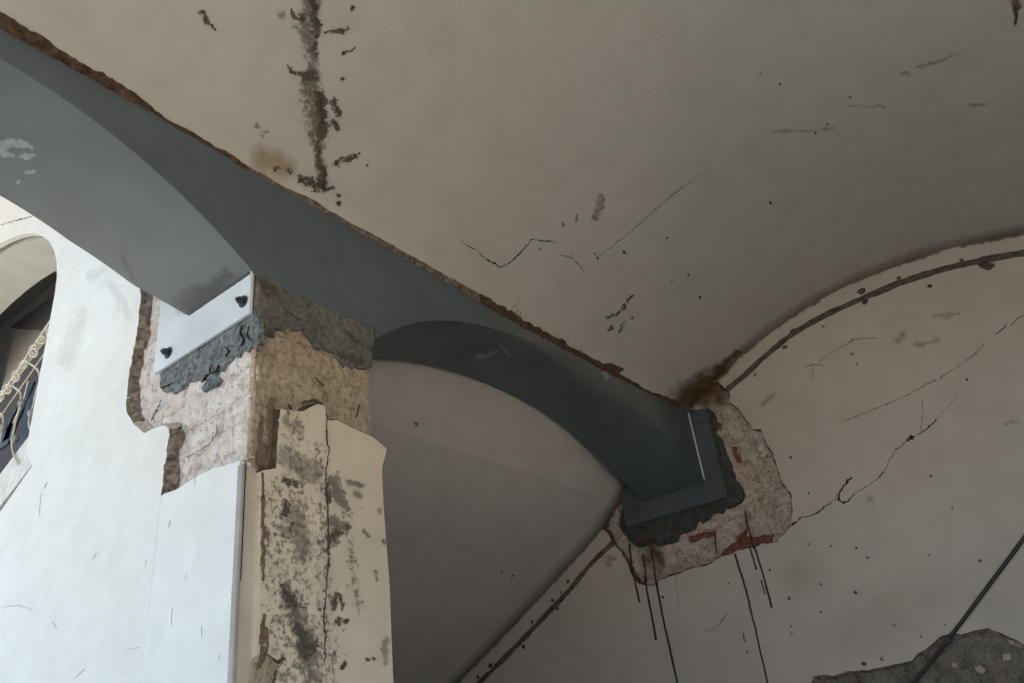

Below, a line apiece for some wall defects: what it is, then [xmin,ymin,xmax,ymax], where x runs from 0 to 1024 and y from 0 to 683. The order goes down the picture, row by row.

leakage [272,0,369,206]
crack [460,167,713,271]
flaking render [0,12,793,586]
leakage [259,405,386,683]
crack [321,570,329,664]
crack [323,413,331,545]
leakage [629,543,678,683]
corrosion [676,350,741,409]
leakage [734,553,768,683]
leakage [744,511,773,608]
crack [790,315,1024,527]
flaking render [812,628,1024,683]